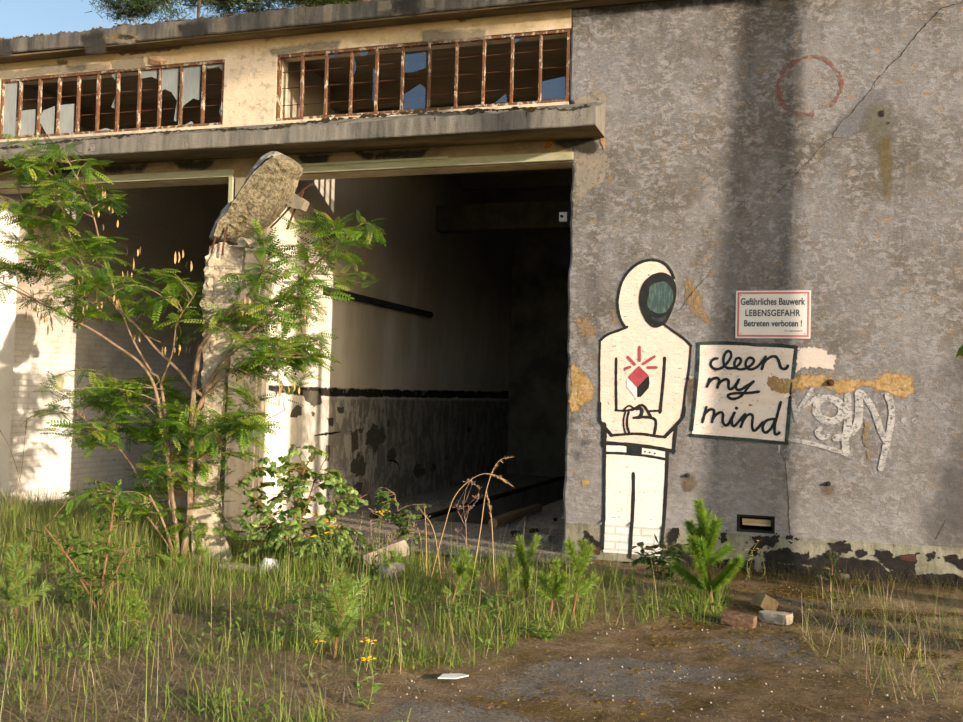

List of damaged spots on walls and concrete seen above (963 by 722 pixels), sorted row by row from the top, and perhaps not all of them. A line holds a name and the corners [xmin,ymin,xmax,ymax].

crack [731,0,963,249]
peeling [290,390,322,418]
peeling [568,362,597,413]
peeling [790,367,915,398]
peeling [350,419,397,495]
peeling [710,533,963,587]